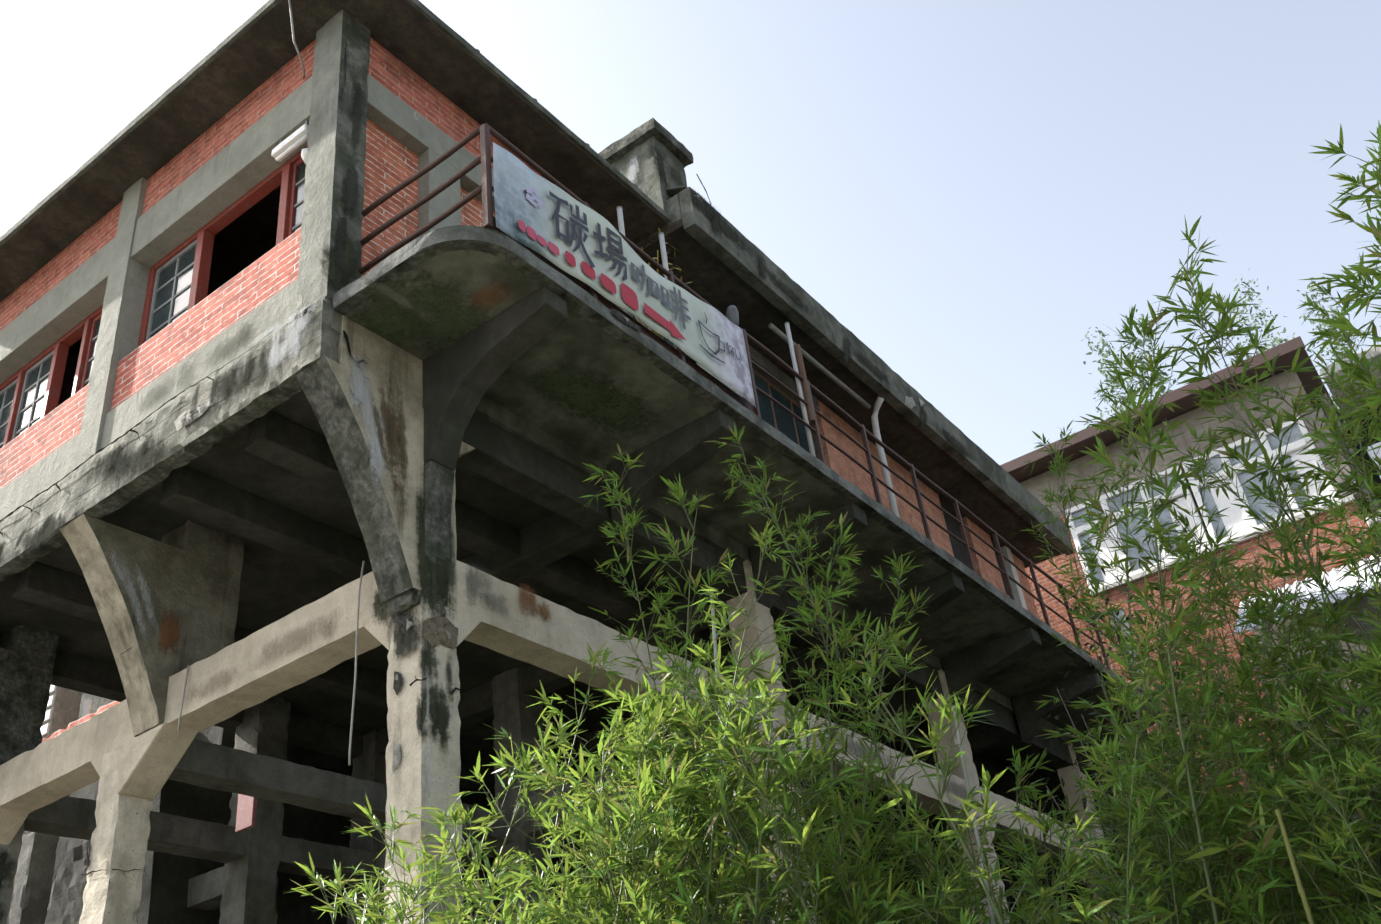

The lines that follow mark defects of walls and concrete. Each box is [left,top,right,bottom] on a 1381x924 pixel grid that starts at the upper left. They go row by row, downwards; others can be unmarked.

damp [373,388,456,605]
damp [373,591,388,621]
corrosion [521,587,550,620]
damp [394,626,404,655]
spalling [392,614,458,648]
damp [416,640,453,747]
damp [0,853,15,888]